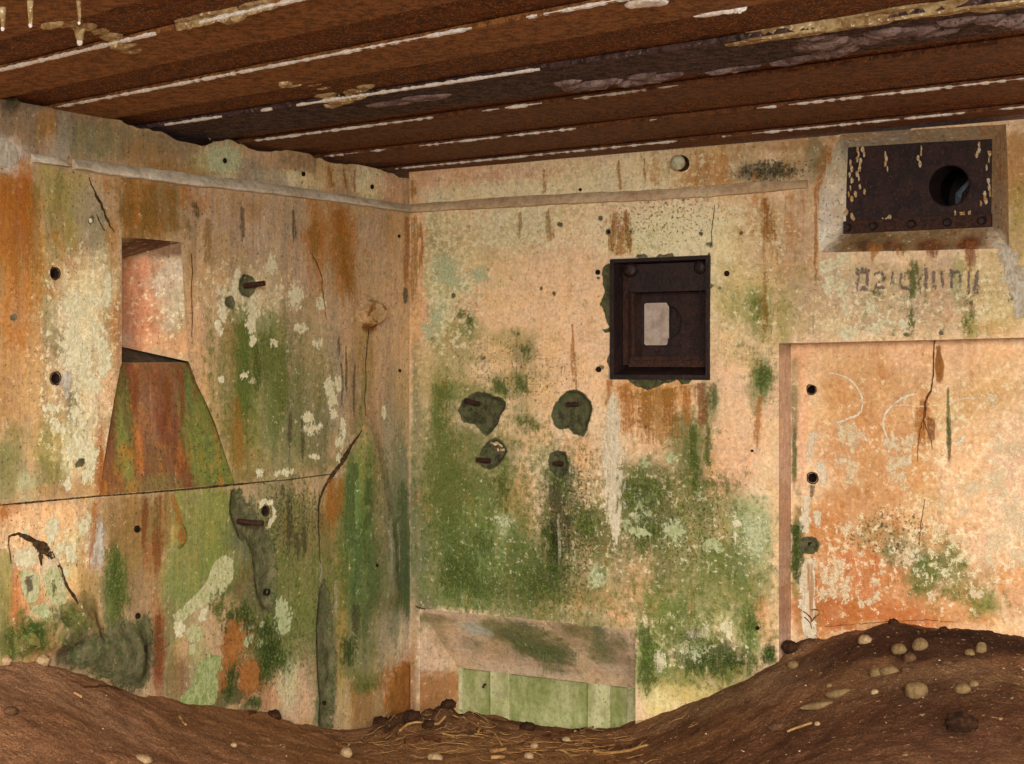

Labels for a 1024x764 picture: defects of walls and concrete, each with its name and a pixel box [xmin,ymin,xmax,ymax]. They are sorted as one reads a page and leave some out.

crack [89,177,115,232]
rust [608,210,631,254]
crack [0,330,369,589]
water stain [337,341,355,412]
spalling [458,392,507,469]
spalling [548,450,570,488]
spalling [551,390,593,437]
efflorescence [601,391,627,545]
rust [605,380,709,430]
water stain [688,424,713,495]
crack [917,340,936,461]
crack [8,532,79,604]